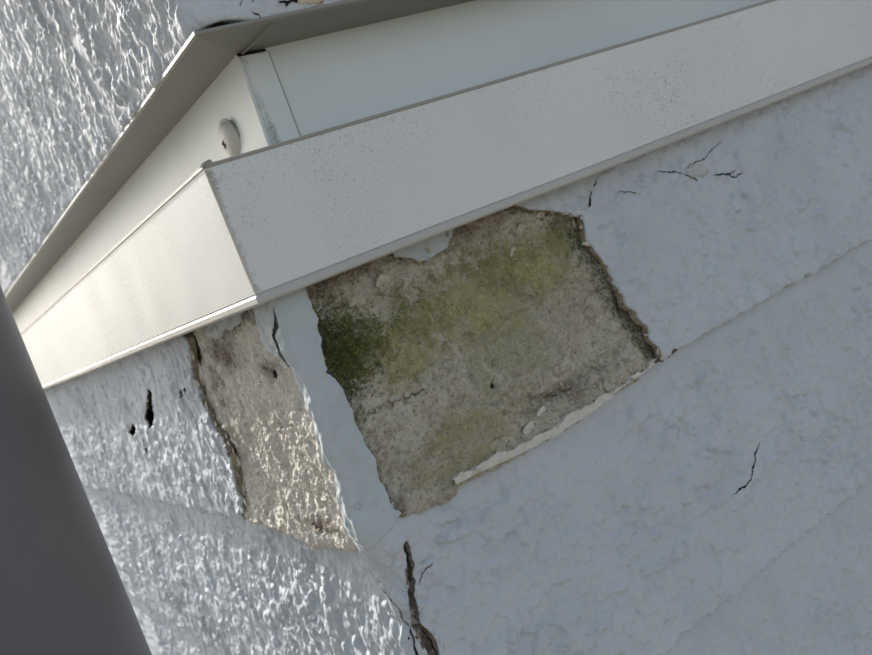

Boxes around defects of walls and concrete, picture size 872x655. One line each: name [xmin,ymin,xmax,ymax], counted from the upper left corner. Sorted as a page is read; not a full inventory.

crack [659,143,743,181]
spalling [306,172,678,518]
spalling [140,408,154,454]
spalling [186,308,358,552]
crack [733,443,760,495]
crack [378,541,439,655]